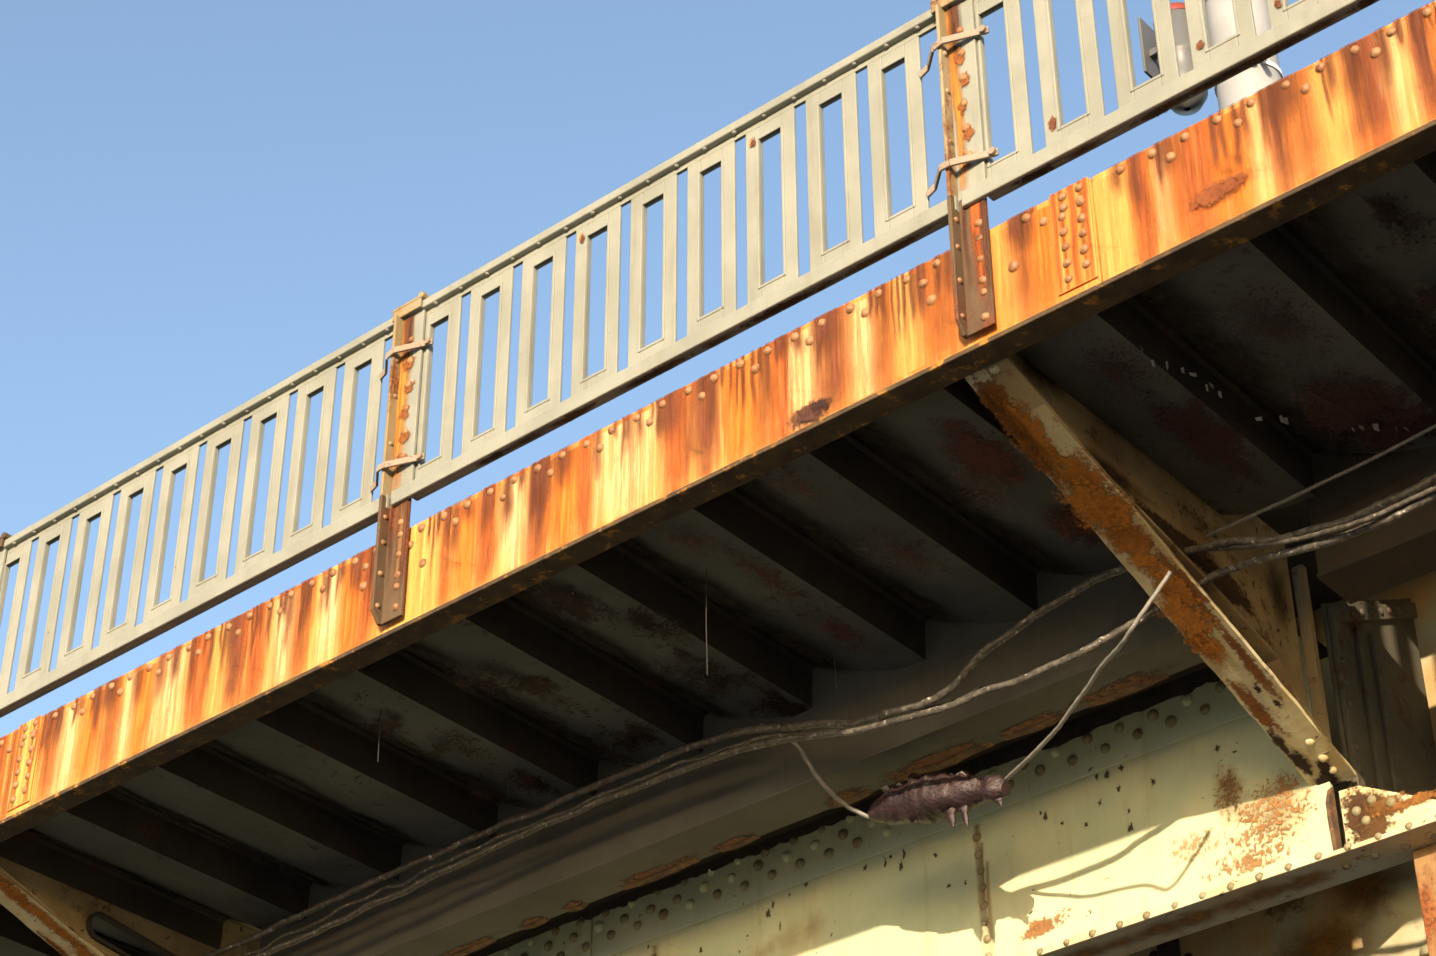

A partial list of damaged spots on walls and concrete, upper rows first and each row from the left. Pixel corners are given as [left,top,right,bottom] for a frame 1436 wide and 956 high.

rust [946,5,986,186]
rust [1012,142,1098,186]
rust [1114,0,1436,260]
rust [1008,177,1094,307]
rust [420,199,989,606]
rust [0,314,415,820]
rust [965,369,1285,740]
rust [887,667,1171,784]
rust [1202,760,1317,884]
rust [1341,785,1436,844]
rust [1021,908,1071,940]
rust [1074,871,1394,956]